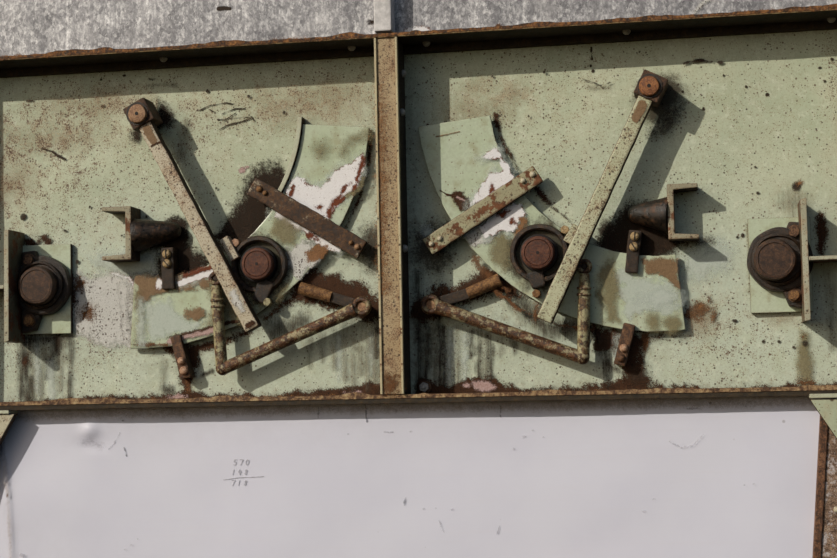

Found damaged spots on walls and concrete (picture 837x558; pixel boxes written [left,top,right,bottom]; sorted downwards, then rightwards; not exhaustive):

rust [0,4,837,61]
rust [493,112,522,174]
rust [226,84,392,359]
peeling [284,152,366,219]
peeling [440,147,514,213]
peeling [465,202,527,247]
rust [534,187,571,222]
rust [409,255,578,339]
rust [683,294,717,323]
rust [65,323,699,400]
leakage [415,317,494,390]